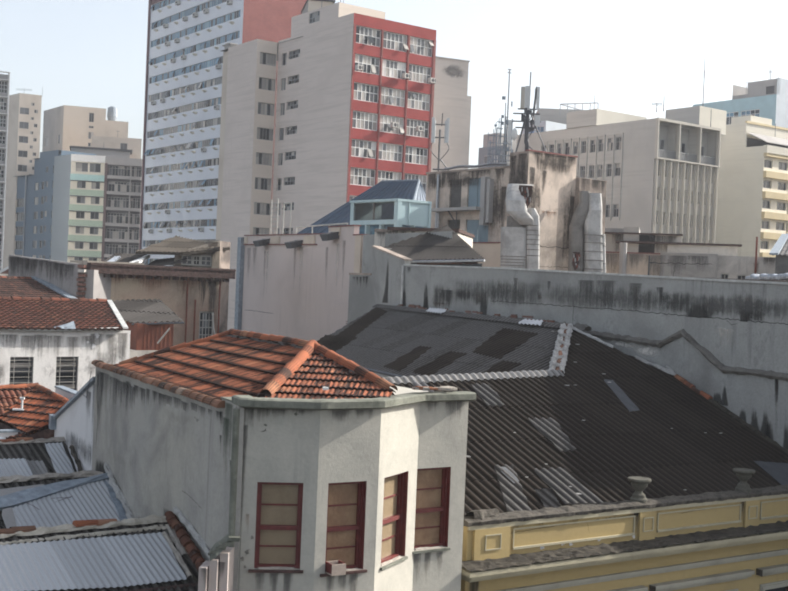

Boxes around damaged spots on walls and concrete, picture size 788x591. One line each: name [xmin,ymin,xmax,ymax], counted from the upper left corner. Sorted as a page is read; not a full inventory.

damp [428,152,575,227]
damp [562,197,575,255]
damp [423,278,541,315]
damp [548,280,640,307]
damp [647,287,785,322]
damp [2,333,232,444]